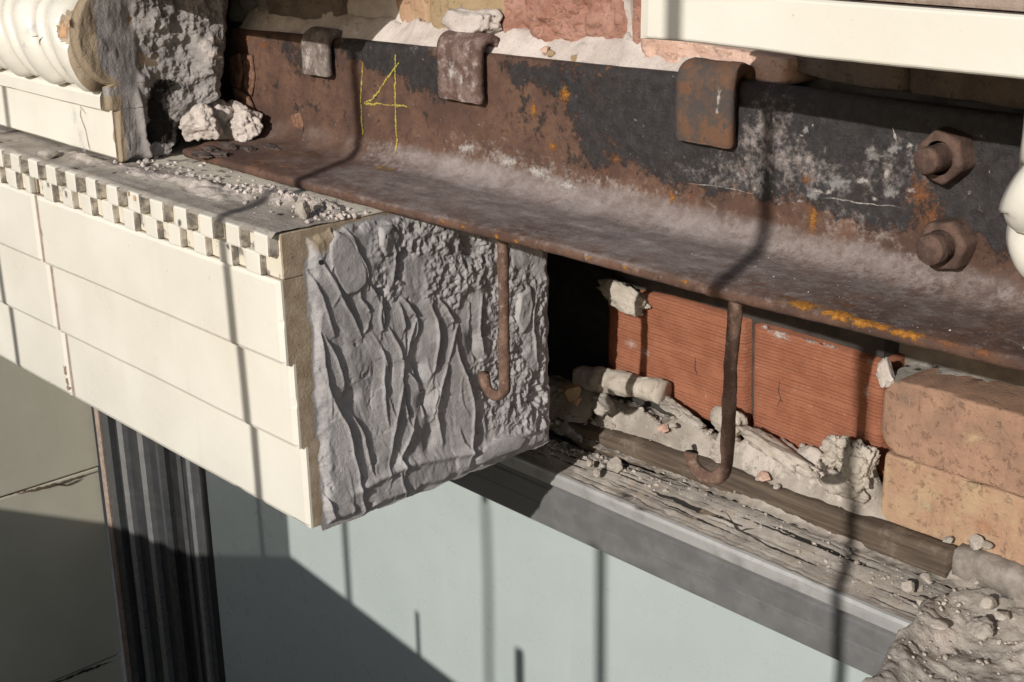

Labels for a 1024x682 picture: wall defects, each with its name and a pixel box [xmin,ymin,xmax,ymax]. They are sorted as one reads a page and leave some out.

spalling [57,17,70,38]
spalling [502,0,641,44]
corrosion [229,36,267,111]
damp [529,167,572,189]
corrosion [778,296,926,343]